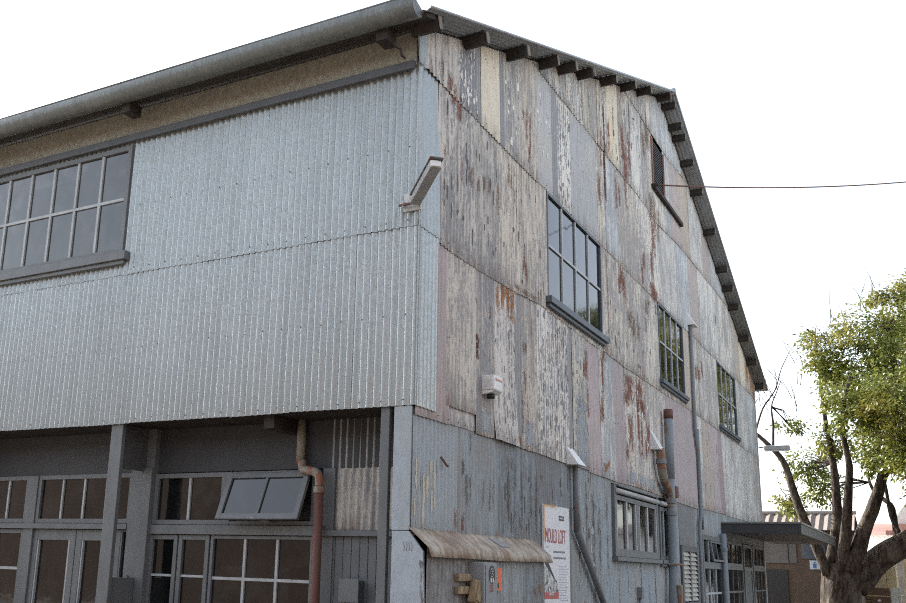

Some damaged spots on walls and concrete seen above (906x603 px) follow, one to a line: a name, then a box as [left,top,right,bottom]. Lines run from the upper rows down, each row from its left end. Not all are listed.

peeling [460,50,478,120]
peeling [444,141,488,221]
peeling [559,123,572,206]
rust [597,96,631,209]
rust [489,253,535,322]
rust [626,194,660,338]
peeling [539,327,589,454]
rust [624,375,650,461]